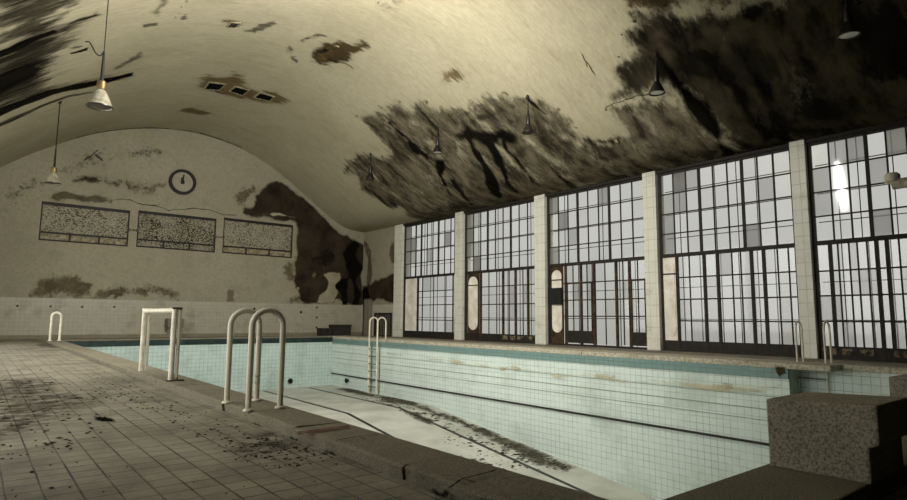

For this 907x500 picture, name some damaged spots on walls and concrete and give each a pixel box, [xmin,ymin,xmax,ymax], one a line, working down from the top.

leakage [0,0,142,126]
leakage [613,0,907,157]
leakage [29,276,179,301]
flaking render [242,180,394,305]